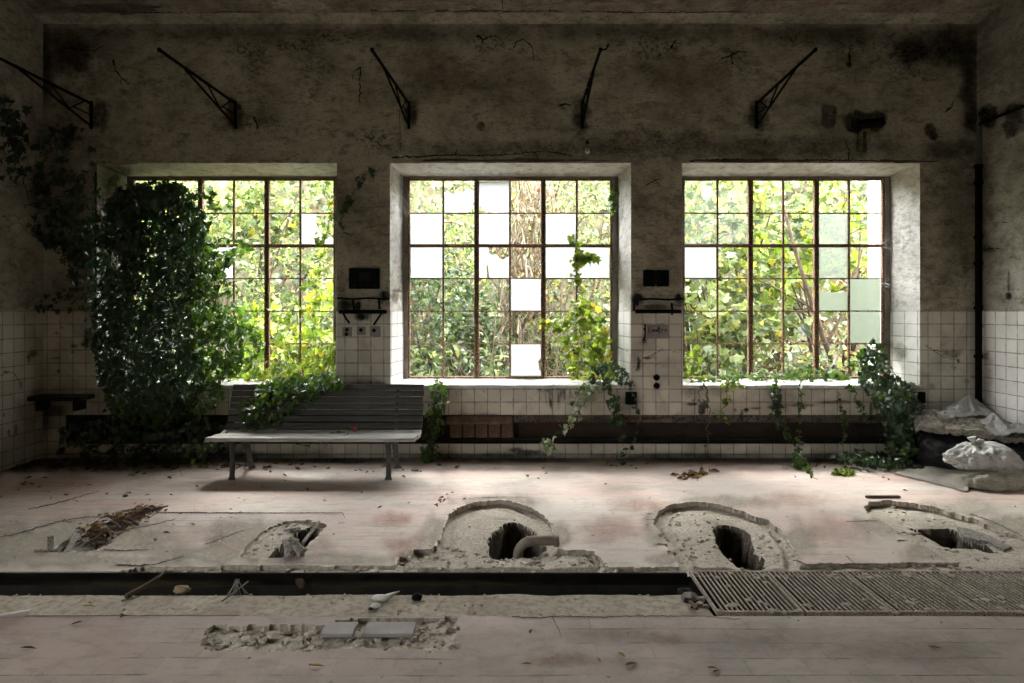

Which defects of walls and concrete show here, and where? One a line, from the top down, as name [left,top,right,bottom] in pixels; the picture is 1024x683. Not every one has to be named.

crack [370,0,559,61]
leakage [900,30,1023,139]
leakage [822,105,886,152]
spalling [34,503,168,552]
spalling [242,521,324,559]
spalling [386,504,611,573]
spalling [655,506,806,577]
spalling [867,504,1024,577]